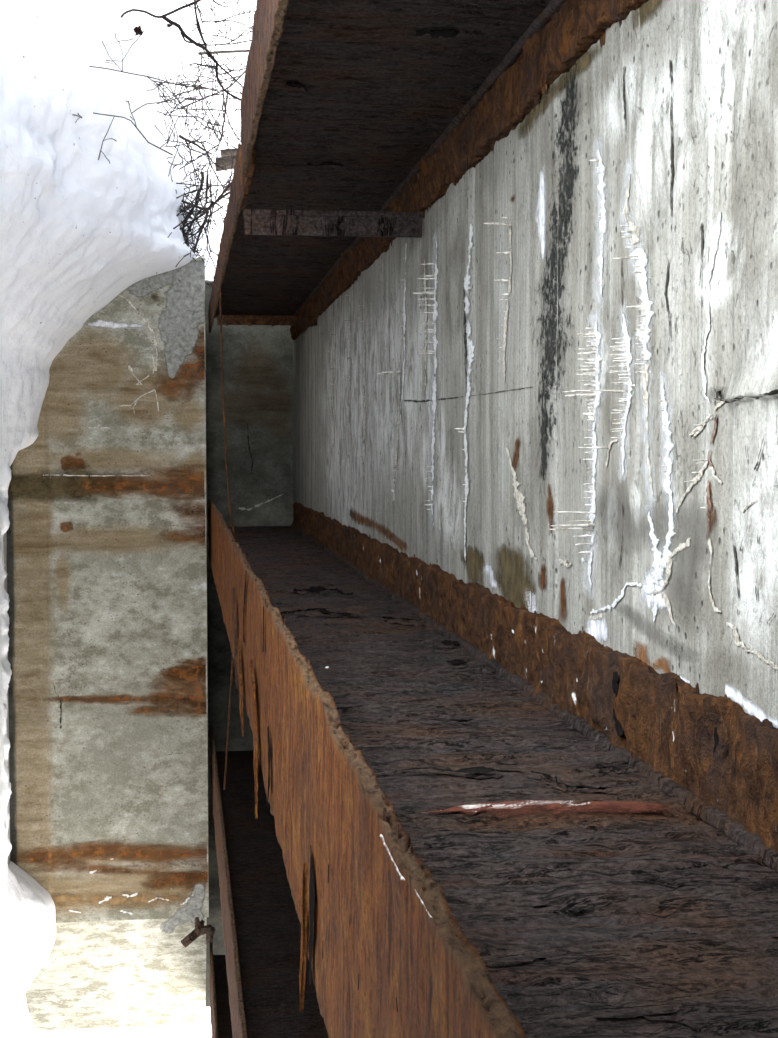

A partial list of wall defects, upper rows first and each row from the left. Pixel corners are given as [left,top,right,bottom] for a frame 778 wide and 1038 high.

rust [633,0,662,26]
rust [519,45,601,137]
leakage [535,68,708,657]
crack [689,212,778,670]
rust [8,453,205,542]
rust [350,509,407,551]
rust [461,545,546,611]
rust [53,658,207,716]
rust [237,636,258,819]
rust [23,843,208,890]
rust [374,785,434,892]
rust [299,863,308,1011]